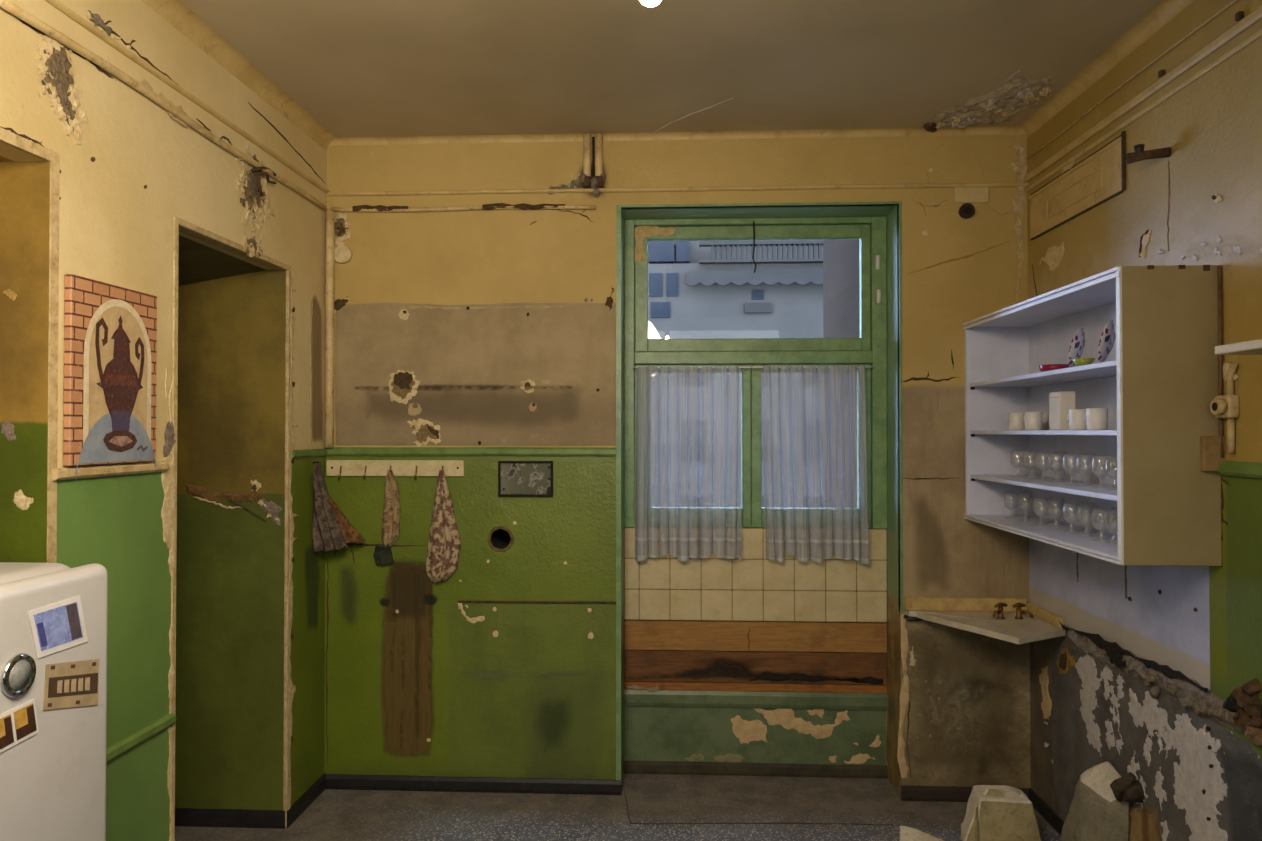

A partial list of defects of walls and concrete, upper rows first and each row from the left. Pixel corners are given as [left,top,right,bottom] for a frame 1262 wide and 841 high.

spalling [36,32,89,148]
spalling [236,145,276,259]
crack [530,209,592,225]
spalling [388,370,420,404]
spalling [407,418,441,447]
peeling [13,489,33,510]
spalling [897,614,932,778]
peeling [684,708,850,763]
peeling [828,734,881,764]
peeling [1039,622,1262,841]
spalling [899,826,944,841]
spalling [961,785,1042,841]